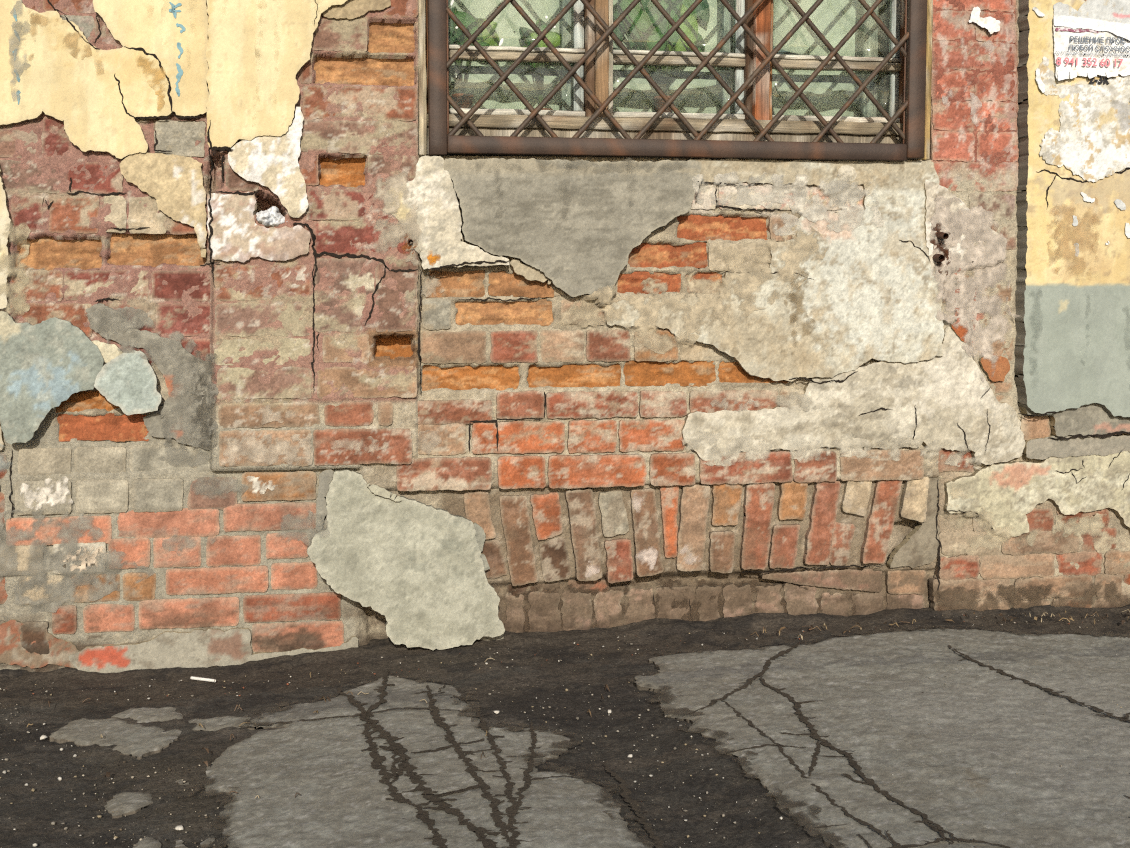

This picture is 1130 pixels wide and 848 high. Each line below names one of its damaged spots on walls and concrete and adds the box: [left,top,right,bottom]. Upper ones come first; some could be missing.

crack [45,0,258,288]
spalling [0,0,1130,655]